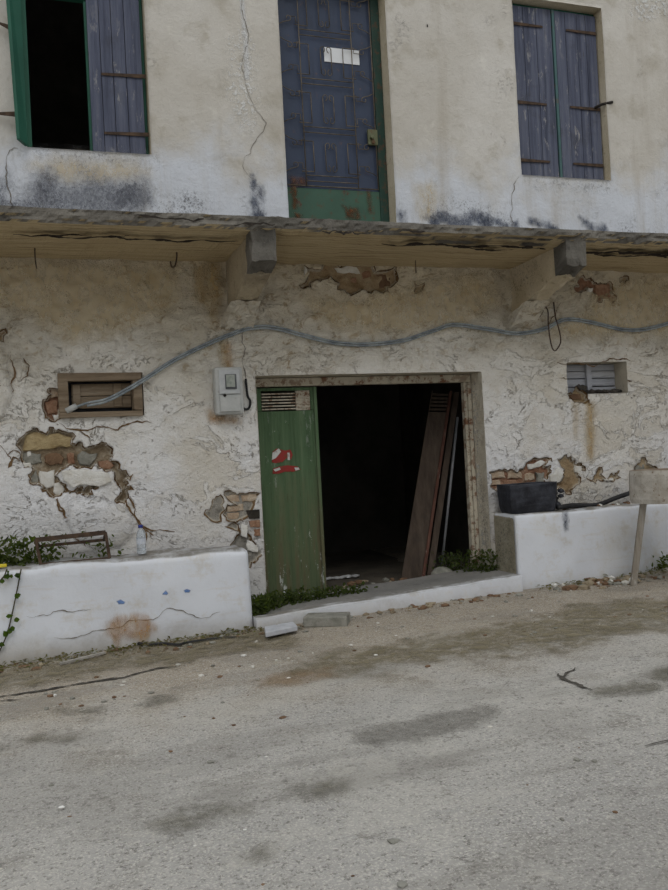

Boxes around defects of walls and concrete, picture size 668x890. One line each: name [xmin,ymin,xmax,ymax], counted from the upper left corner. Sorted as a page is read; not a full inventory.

crack [240,0,267,172]
water stain [14,175,144,211]
water stain [428,201,517,227]
flaking render [299,265,399,296]
flaking render [574,275,629,303]
flaking render [16,388,134,504]
flaking render [471,372,621,574]
flaking render [634,457,658,470]
flaking render [204,490,262,568]
crack [0,666,175,701]